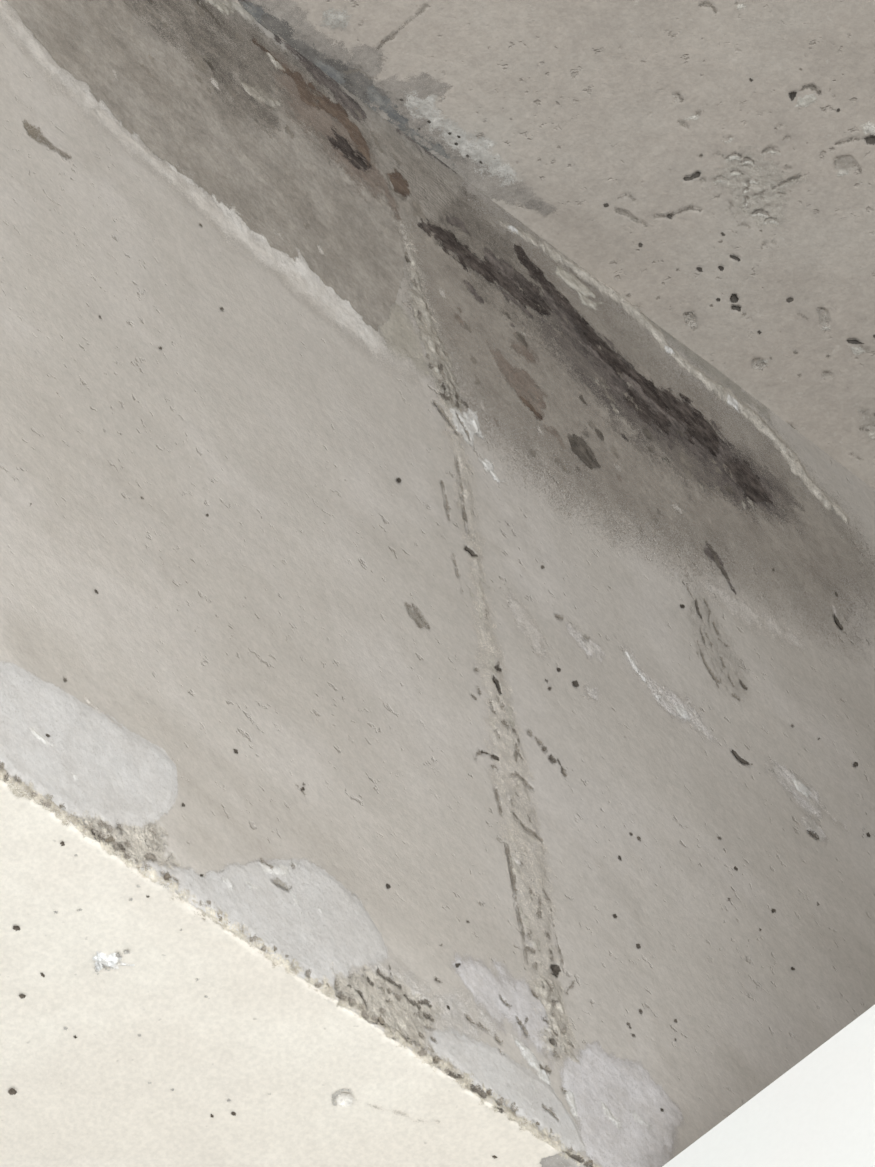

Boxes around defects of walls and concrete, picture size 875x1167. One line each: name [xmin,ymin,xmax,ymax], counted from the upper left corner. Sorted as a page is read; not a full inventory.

spalling [0,762,603,1167]
water stain [0,0,875,666]
crack [395,220,575,1036]
spalling [528,728,568,776]